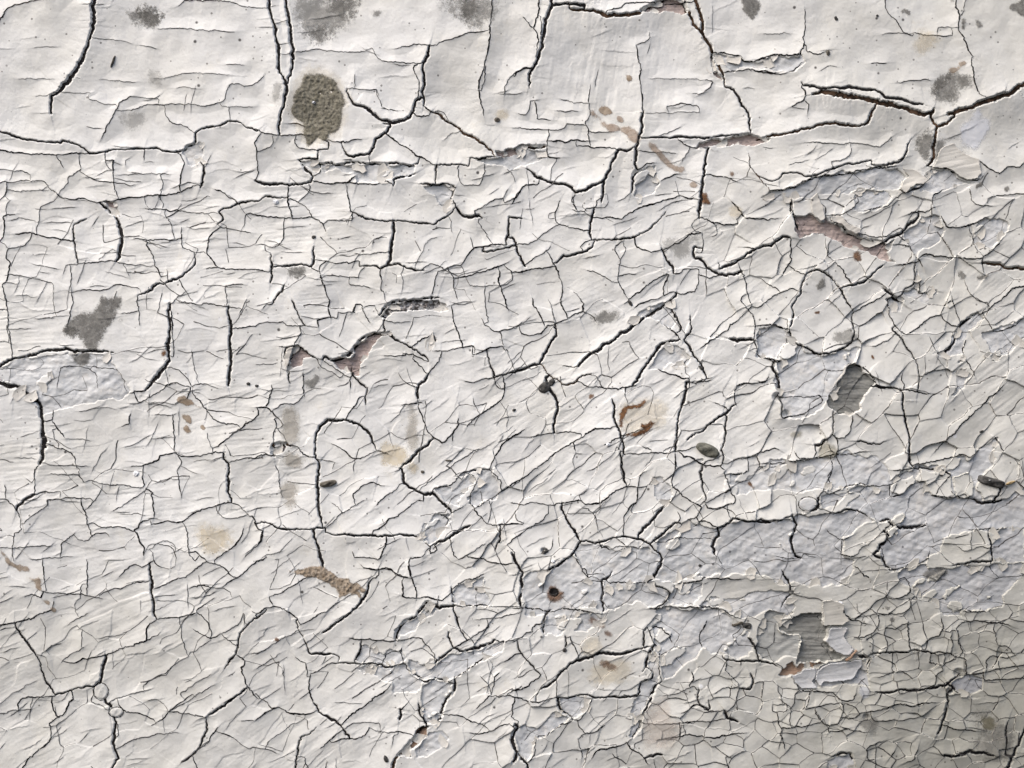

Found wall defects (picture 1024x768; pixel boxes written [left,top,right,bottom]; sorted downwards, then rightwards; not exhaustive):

crack [38,0,156,114]
crack [499,0,1024,173]
crack [748,137,910,193]
peeling [134,221,262,306]
water stain [63,296,121,367]
peeling [282,321,393,376]
peeling [145,379,319,461]
peeling [287,379,487,485]
peeling [352,135,1024,768]
crack [755,411,902,516]
crack [827,519,926,571]
corrosion [548,586,563,602]